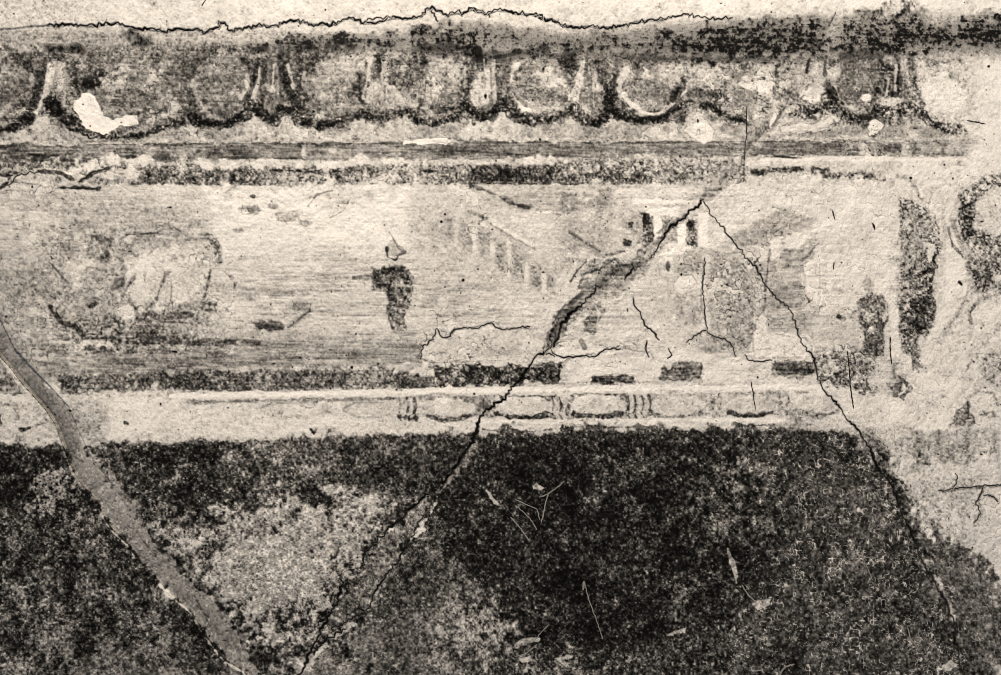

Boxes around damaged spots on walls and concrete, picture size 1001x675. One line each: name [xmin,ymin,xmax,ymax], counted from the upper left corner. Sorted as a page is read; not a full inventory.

spalling [74,93,139,135]
crack [7,171,39,186]
crack [78,168,105,183]
crack [297,199,966,675]
crack [939,473,1001,523]